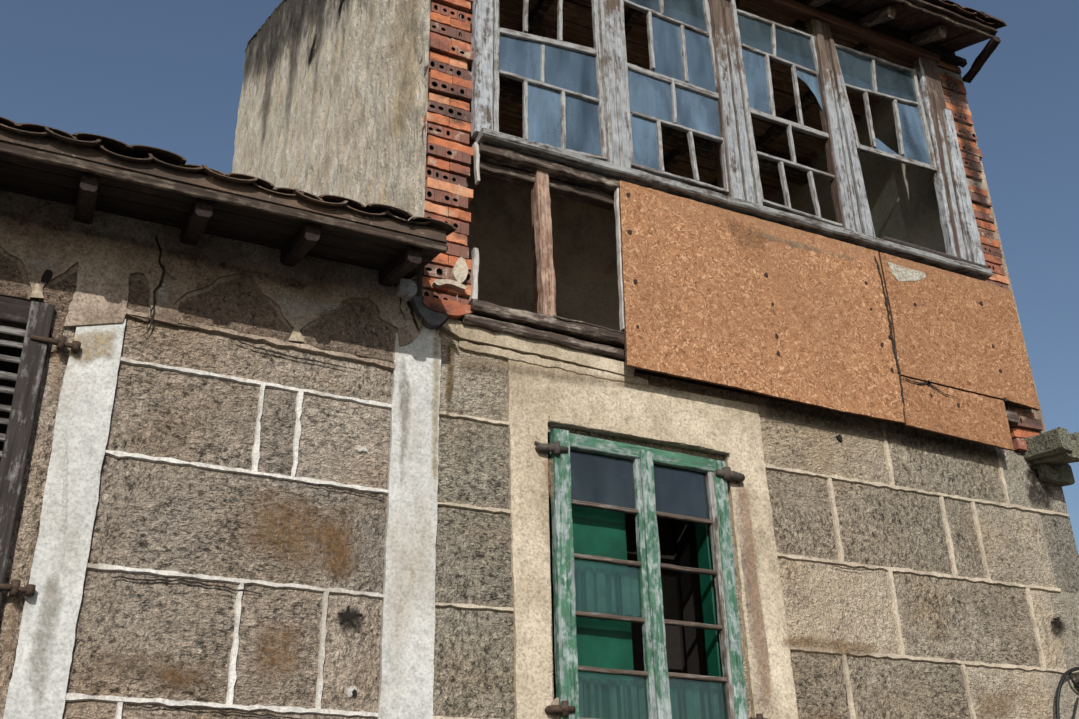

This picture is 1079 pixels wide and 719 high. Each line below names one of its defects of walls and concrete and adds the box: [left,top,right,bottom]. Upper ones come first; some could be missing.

damp [286,18,321,99]
crack [145,236,176,334]